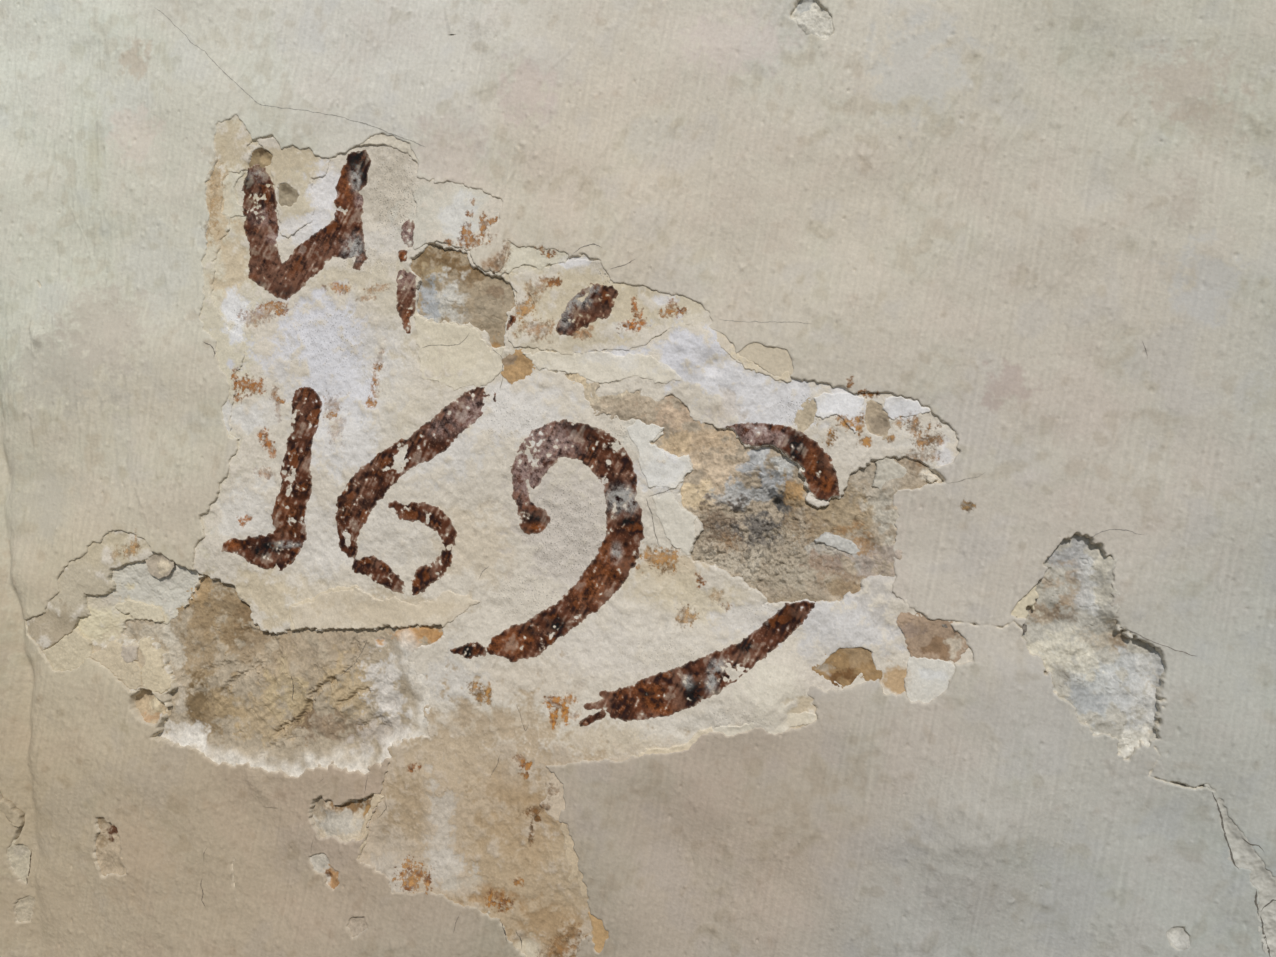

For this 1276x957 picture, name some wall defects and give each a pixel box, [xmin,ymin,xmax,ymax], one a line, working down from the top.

peeling [791,0,834,39]
peeling [27,115,973,957]
flaking render [1011,534,1164,760]
crack [0,791,32,879]
crack [1172,782,1276,957]